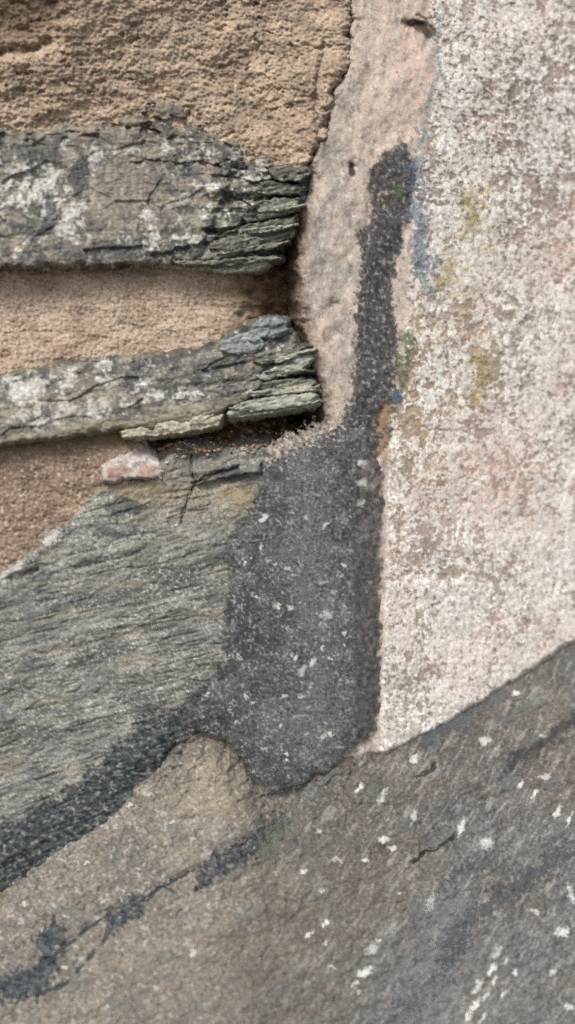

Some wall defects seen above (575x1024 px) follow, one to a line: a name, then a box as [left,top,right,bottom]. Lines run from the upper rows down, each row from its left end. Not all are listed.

water stain [265,126,439,463]
crack [181,455,238,522]